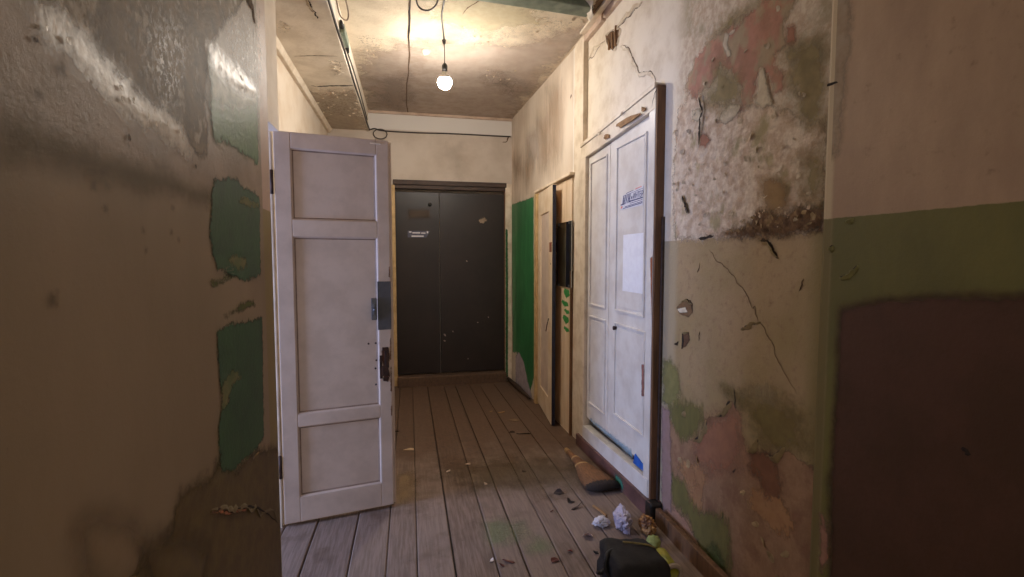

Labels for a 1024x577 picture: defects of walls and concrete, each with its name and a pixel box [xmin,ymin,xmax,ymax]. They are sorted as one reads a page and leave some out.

crack [588,1,657,103]
flaking render [672,0,827,242]
peeling [674,332,690,349]
peeling [677,299,693,317]
crack [697,235,796,392]
peeling [670,391,829,577]